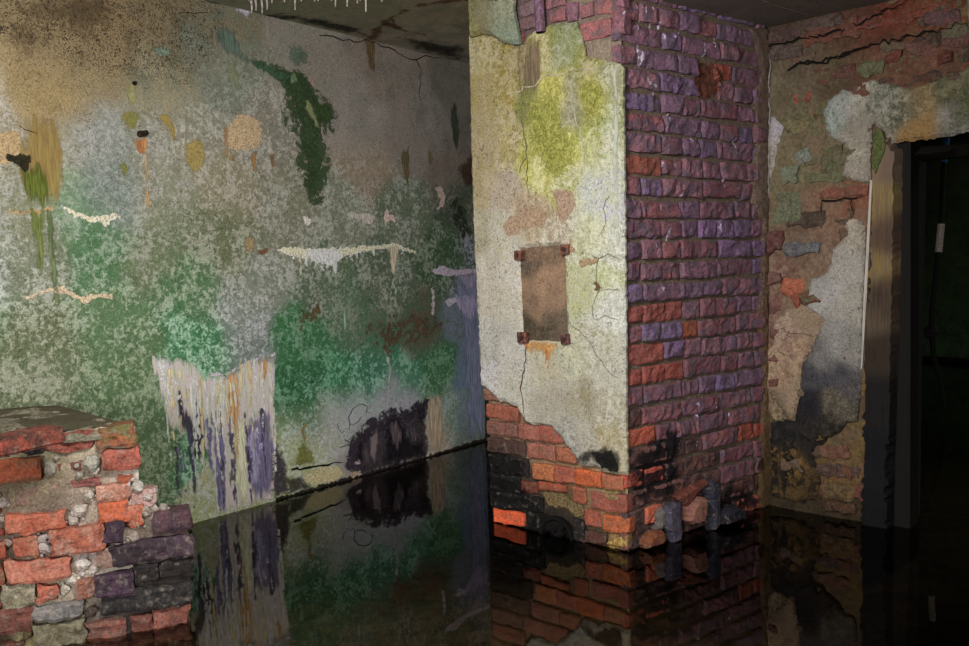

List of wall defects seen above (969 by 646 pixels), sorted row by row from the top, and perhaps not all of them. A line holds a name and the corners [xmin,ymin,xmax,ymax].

peeling [0,131,21,165]
peeling [224,114,262,171]
crack [319,35,443,105]
crack [760,0,969,196]
water stain [10,163,121,304]
water stain [278,242,417,294]
flaking render [766,0,969,514]
water stain [152,265,485,513]